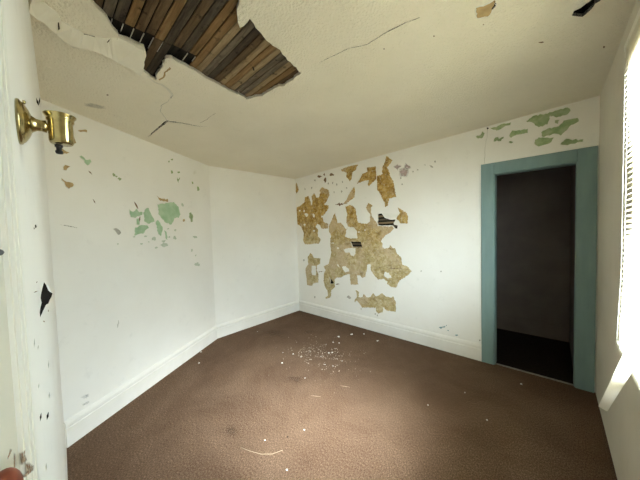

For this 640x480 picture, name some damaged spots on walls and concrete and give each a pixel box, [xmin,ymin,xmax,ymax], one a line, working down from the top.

peeling [475,0,497,19]
hole [573,0,601,17]
peeling [476,107,584,147]
peeling [129,196,193,248]
peeling [297,156,412,316]
hole [40,283,52,317]